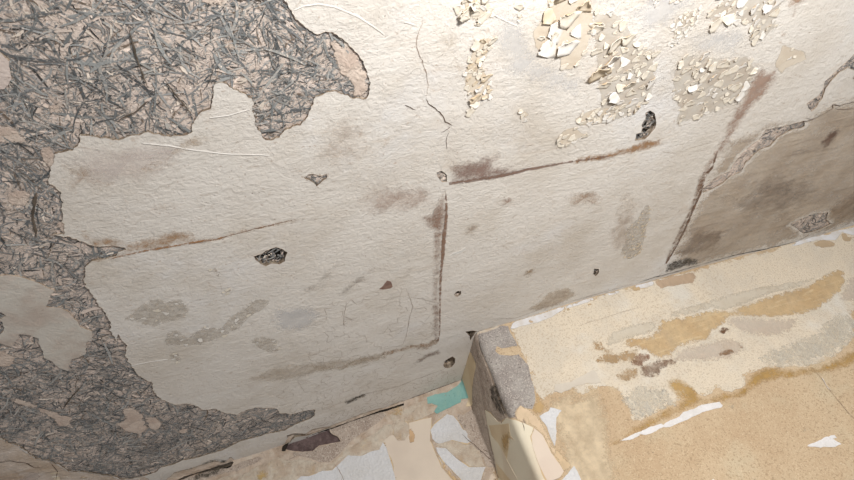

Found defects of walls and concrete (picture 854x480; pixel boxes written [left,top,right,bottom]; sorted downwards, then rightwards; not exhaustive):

peeling [453,0,495,26]
crack [406,23,453,147]
peeling [463,37,498,118]
peeling [533,0,784,148]
spalling [807,54,854,111]
corrosion [576,140,657,162]
spalling [702,121,805,192]
leakage [666,69,854,271]
spalling [0,0,386,480]
peeling [436,325,571,470]
leakage [671,380,698,407]
leakage [714,369,793,401]